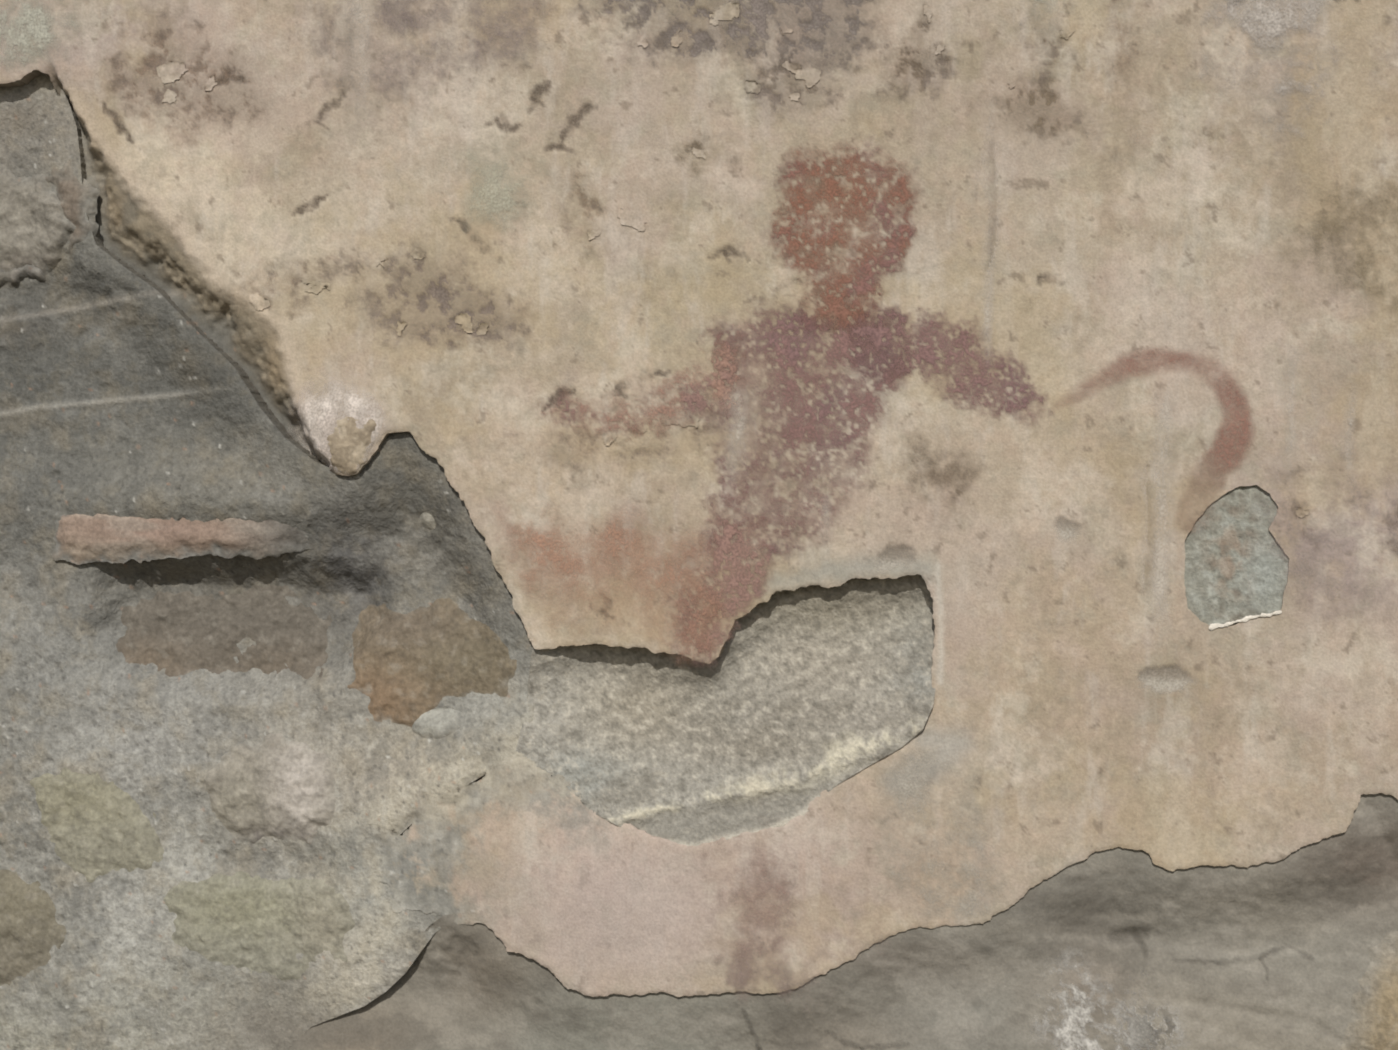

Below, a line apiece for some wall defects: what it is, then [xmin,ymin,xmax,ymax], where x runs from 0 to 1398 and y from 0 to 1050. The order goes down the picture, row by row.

peeling [115,31,239,112]
spalling [0,73,936,1050]
spalling [1184,485,1289,631]
spalling [285,793,1398,1050]
water stain [1040,956,1178,1050]